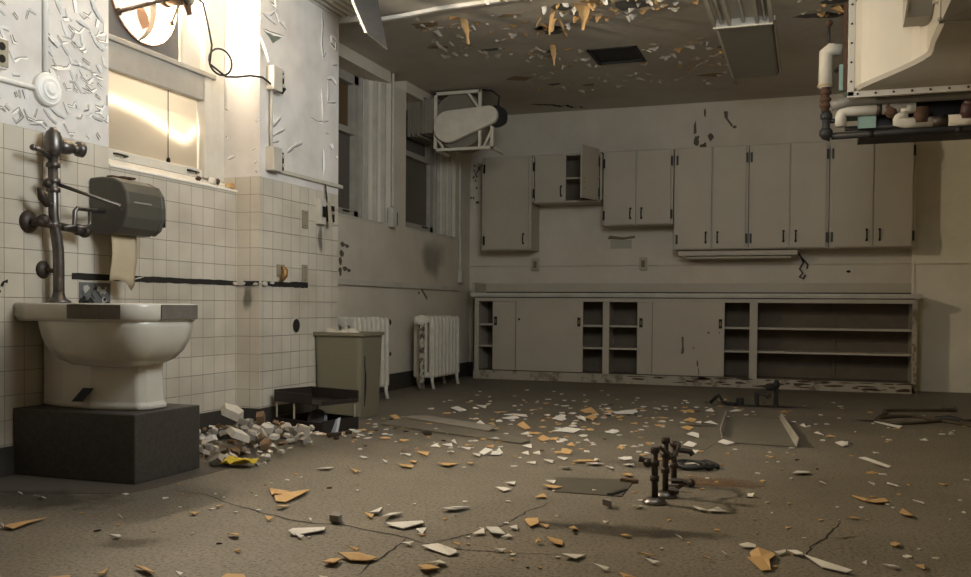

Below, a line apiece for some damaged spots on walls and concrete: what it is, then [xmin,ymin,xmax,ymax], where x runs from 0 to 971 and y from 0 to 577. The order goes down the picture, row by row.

peeling [0,0,109,140]
peeling [411,0,739,94]
peeling [794,0,849,18]
crack [177,490,554,574]
crack [802,522,857,558]